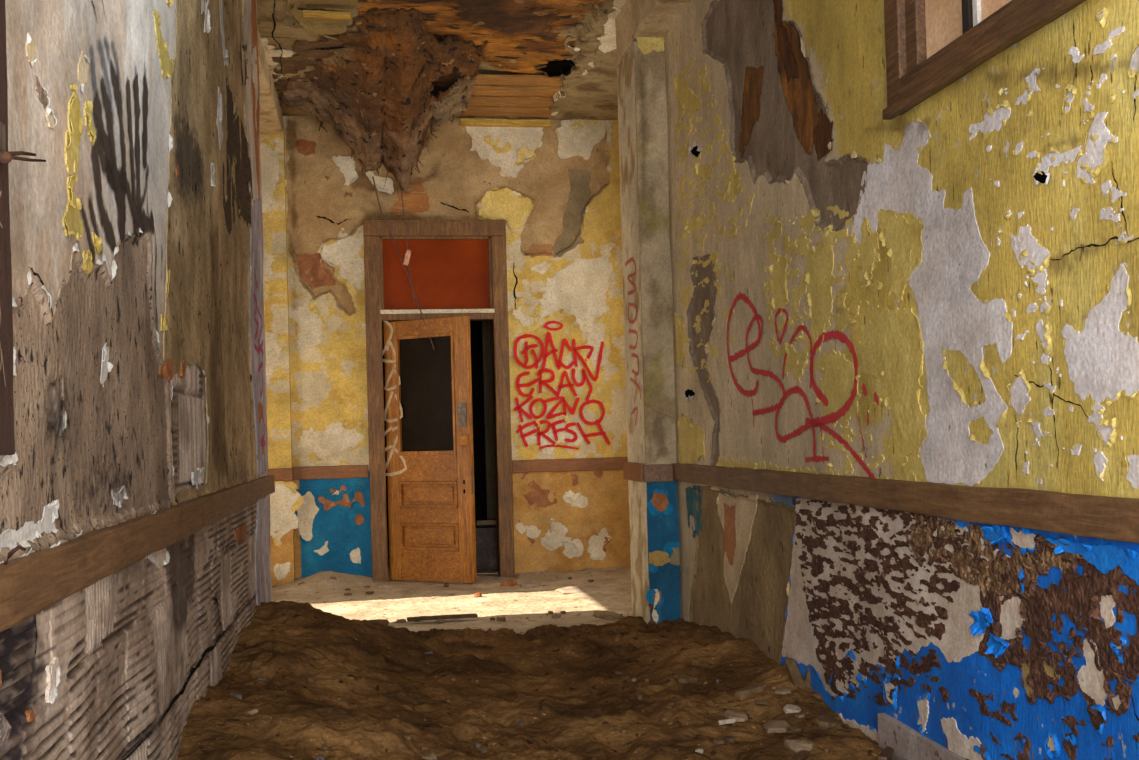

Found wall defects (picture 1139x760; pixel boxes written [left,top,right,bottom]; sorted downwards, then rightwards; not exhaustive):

peeling [635,36,665,54]
spalling [0,0,626,606]
peeling [673,0,1139,489]
crack [1050,163,1139,260]
crack [123,596,226,760]